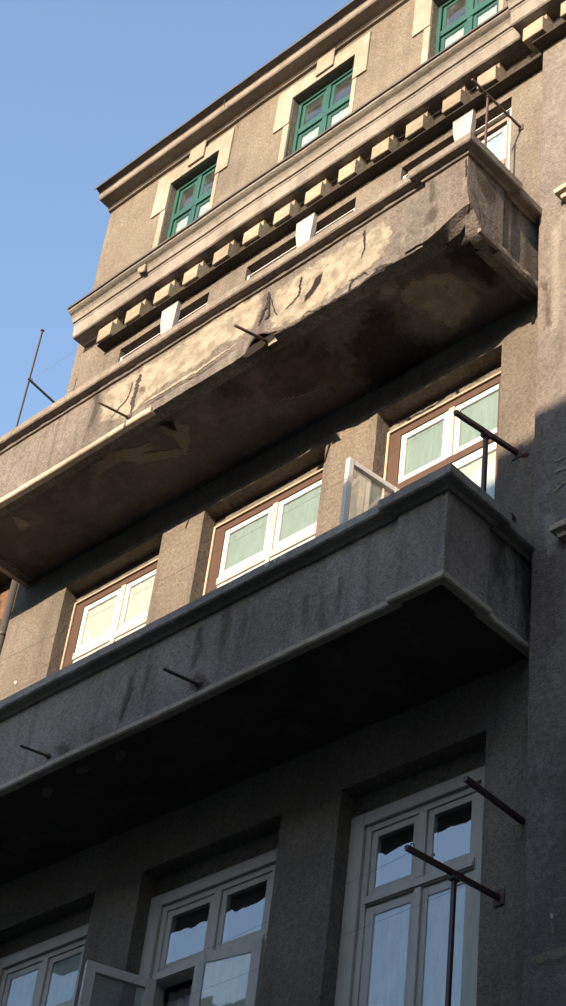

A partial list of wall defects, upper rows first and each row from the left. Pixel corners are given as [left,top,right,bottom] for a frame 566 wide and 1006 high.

crack [465,159,494,223]
crack [258,230,413,332]
water stain [449,244,494,286]
crack [111,374,142,418]